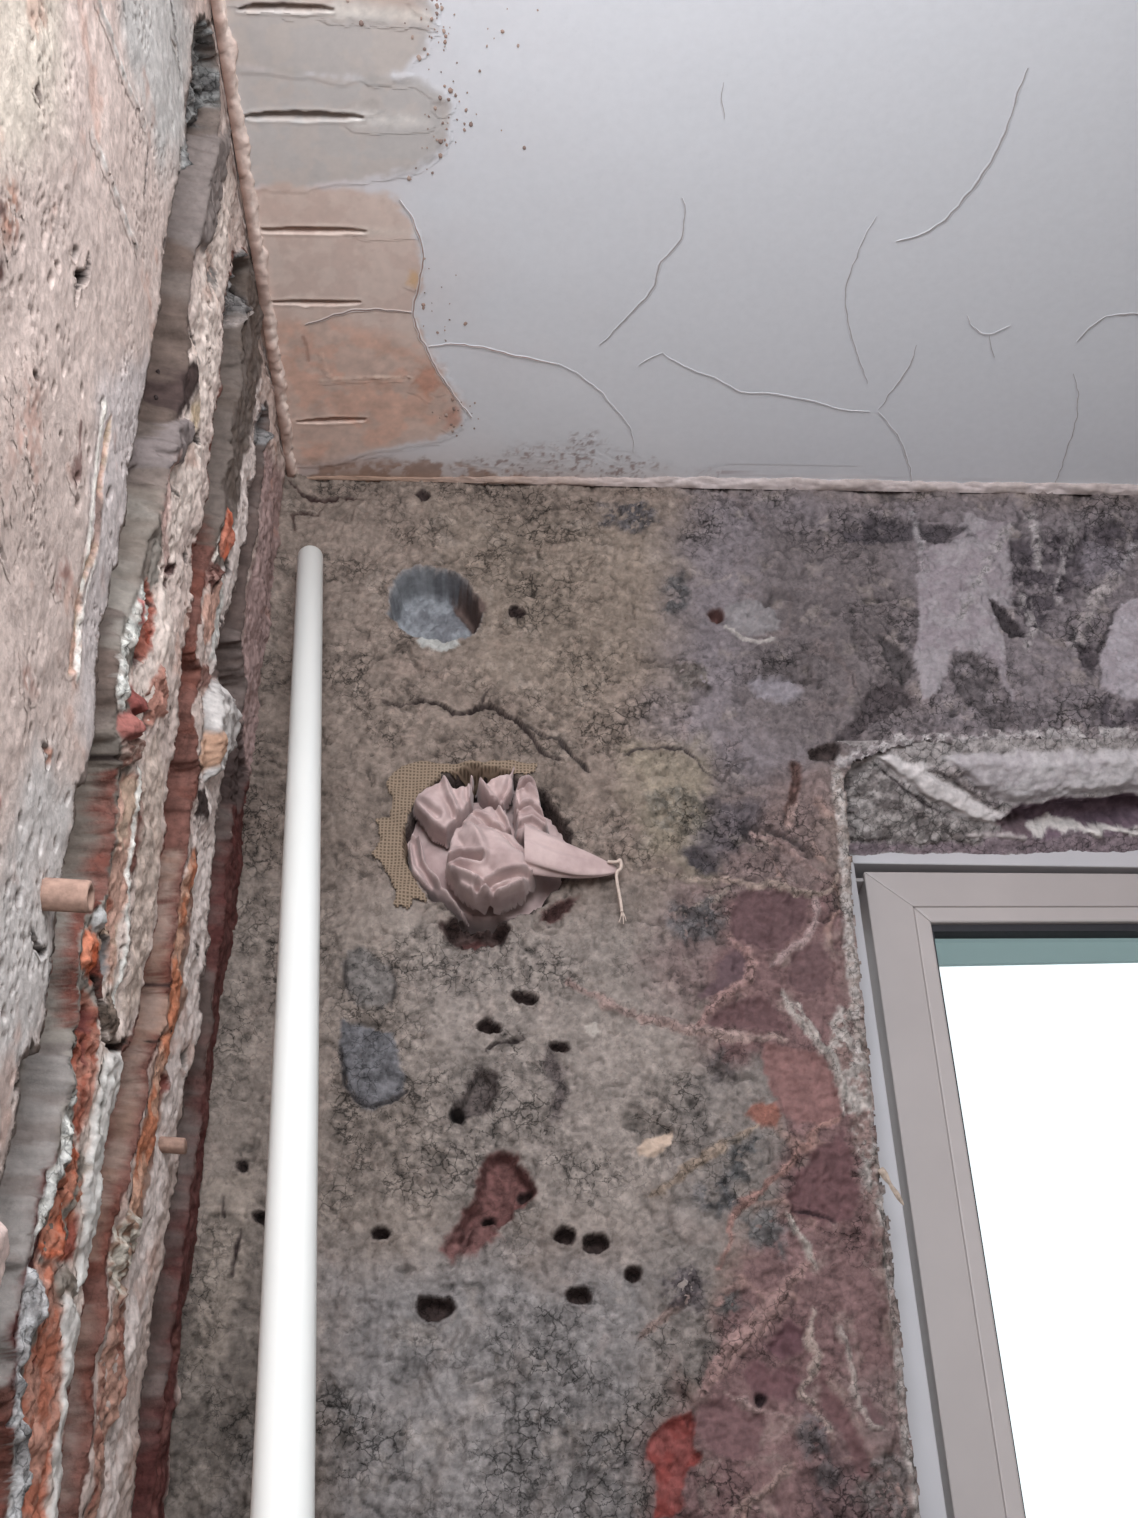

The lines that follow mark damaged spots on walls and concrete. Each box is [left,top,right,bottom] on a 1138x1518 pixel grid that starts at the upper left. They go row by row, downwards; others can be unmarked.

spalling [70,240,92,309]
crack [305,198,687,453]
crack [638,68,1029,482]
crack [1054,312,1138,483]
flaking render [201,506,236,666]
spalling [196,720,252,818]
crack [380,682,754,784]
crack [754,821,819,858]
flaking render [21,392,201,1518]
flaking render [694,512,1138,1518]
peeling [634,1127,676,1161]
flaking render [641,1408,726,1518]